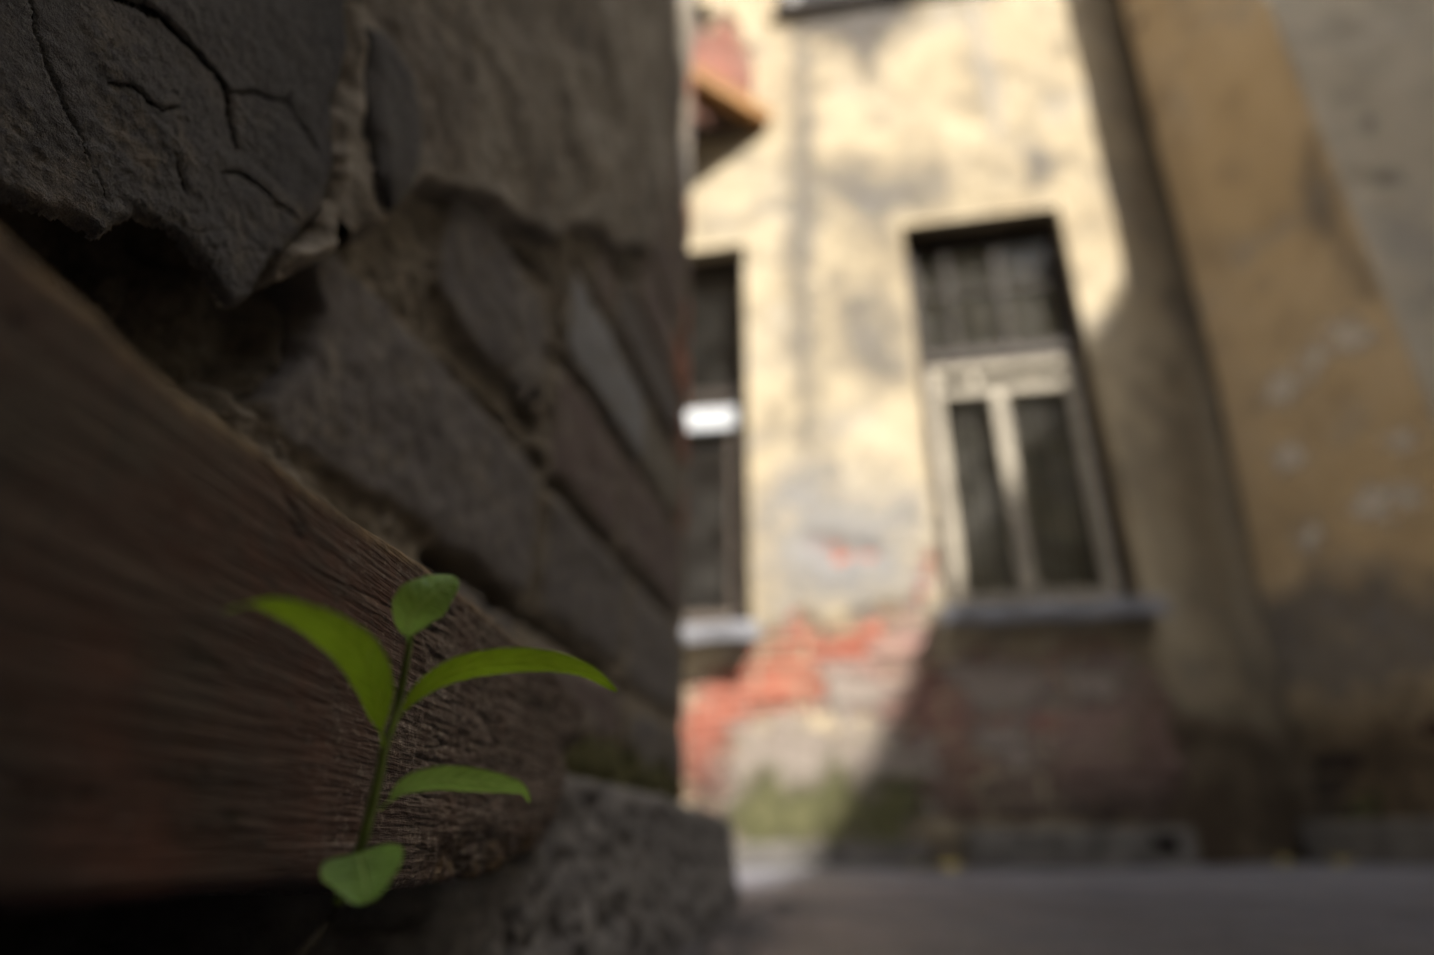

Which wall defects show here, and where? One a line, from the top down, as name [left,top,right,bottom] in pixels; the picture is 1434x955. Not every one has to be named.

crack [108,0,318,216]
flaking render [680,598,938,814]
damp [1260,578,1434,700]